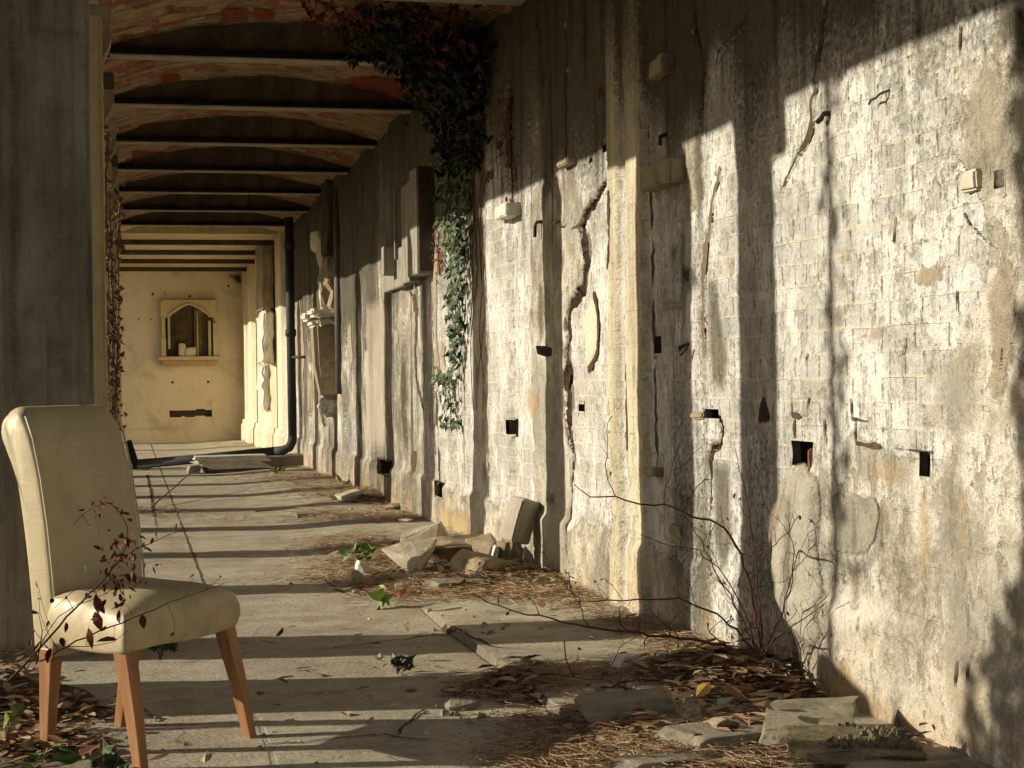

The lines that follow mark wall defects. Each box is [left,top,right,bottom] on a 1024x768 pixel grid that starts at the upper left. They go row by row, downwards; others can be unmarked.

crack [781,0,827,190]
crack [563,156,609,579]
peeling [582,291,599,372]
crack [700,166,721,354]
crack [706,419,724,512]